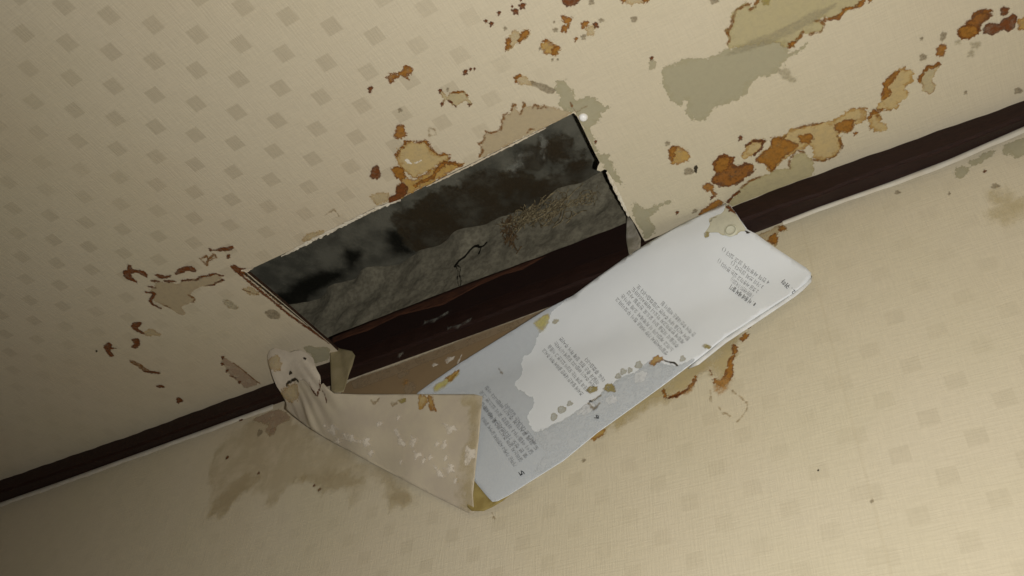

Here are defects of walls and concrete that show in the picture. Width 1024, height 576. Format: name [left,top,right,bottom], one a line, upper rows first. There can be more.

damp [388,74,622,254]
crack [454,242,487,286]
peeling [341,309,546,394]
damp [602,341,736,430]